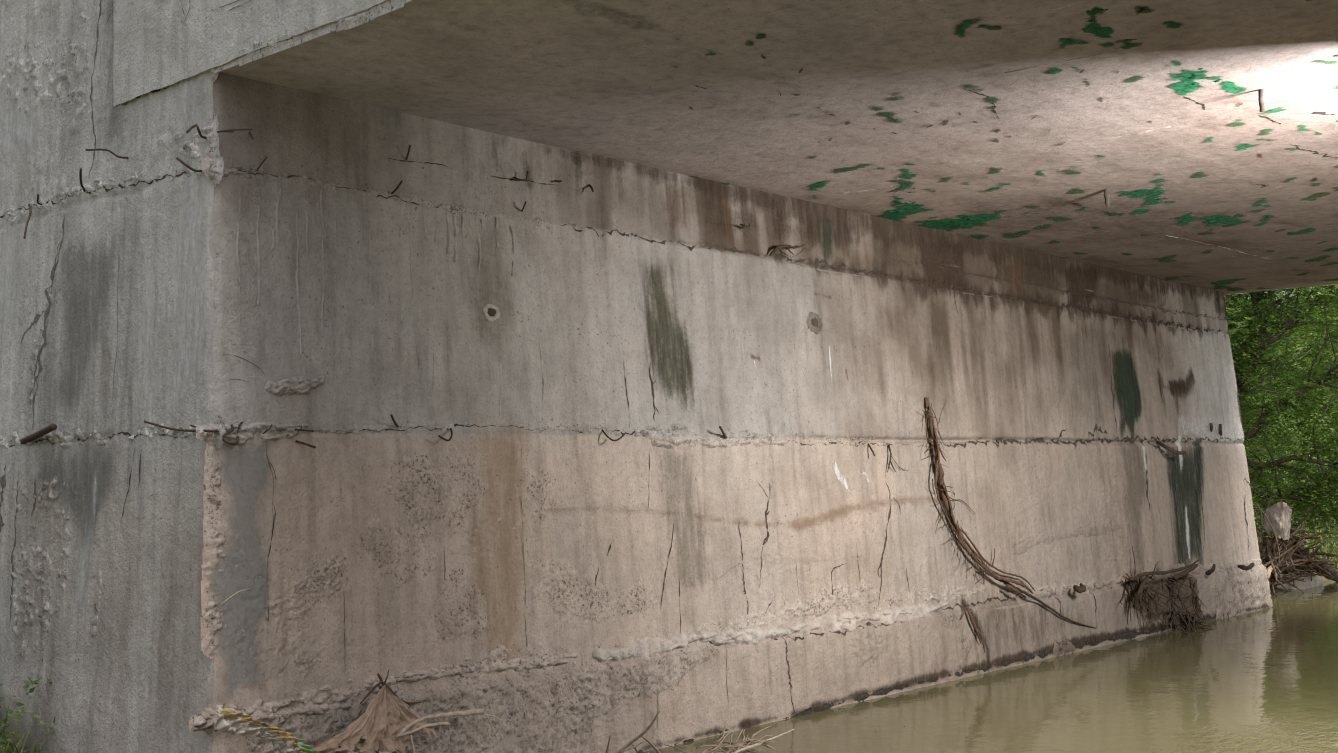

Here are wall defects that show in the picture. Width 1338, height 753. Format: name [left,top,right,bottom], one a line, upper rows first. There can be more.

crack [0,0,196,630]
water stain [648,268,692,394]
water stain [695,179,1227,336]
spalling [0,424,57,447]
peeling [10,475,78,664]
spalling [128,420,340,659]
crack [237,364,729,702]
crack [721,481,910,710]
crack [789,349,1242,510]
water stain [1113,351,1147,523]
water stain [1168,424,1203,564]
peeling [189,714,219,732]